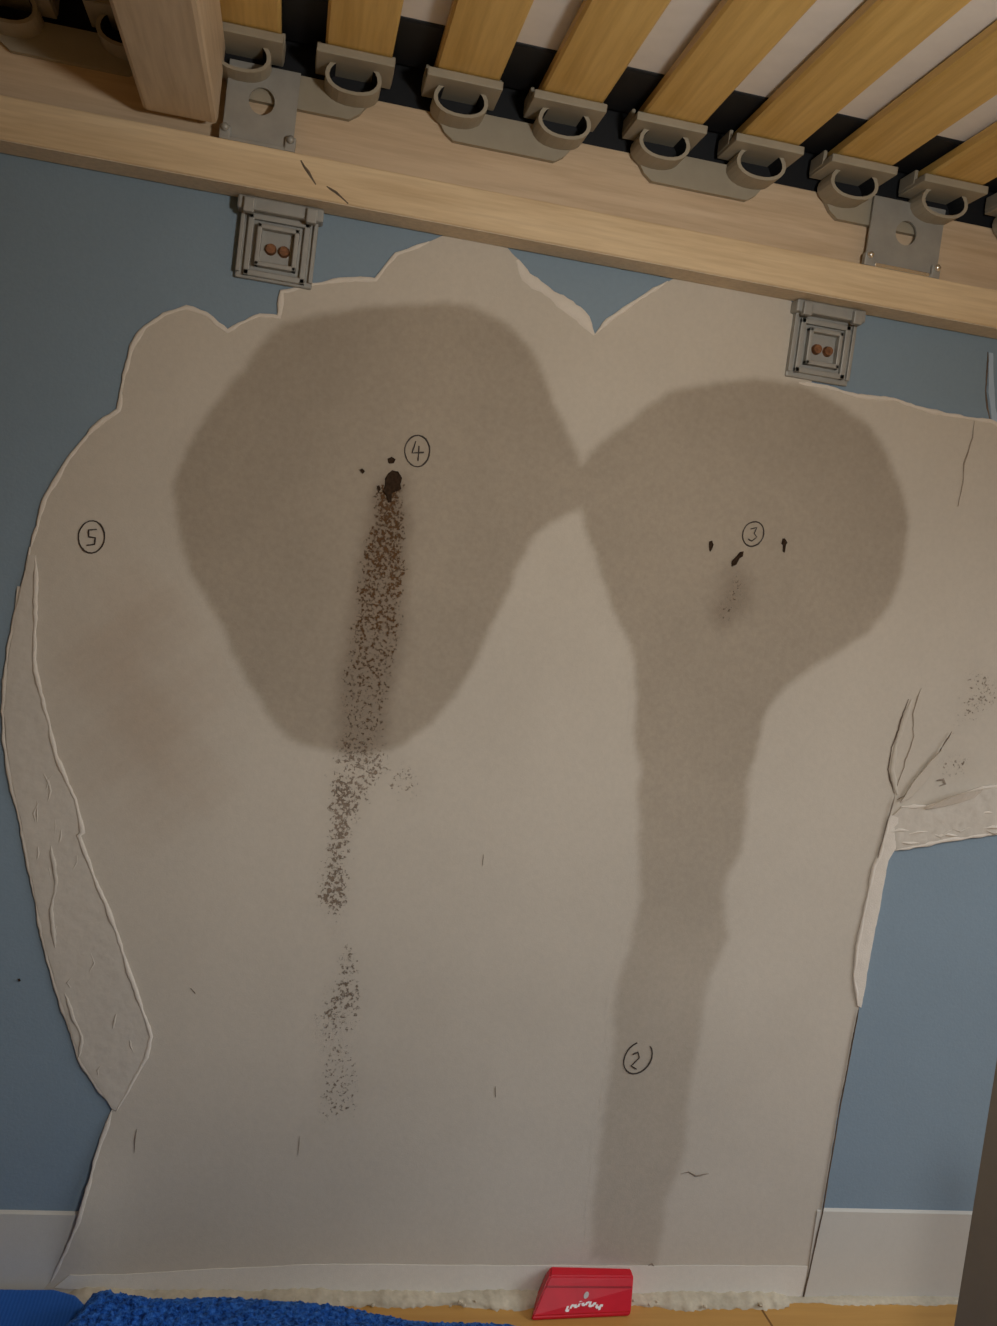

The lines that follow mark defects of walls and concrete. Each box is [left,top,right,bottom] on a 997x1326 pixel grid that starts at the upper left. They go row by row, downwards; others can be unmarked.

crack [958,421,975,506]
peeling [0,236,808,1297]
damp [15,293,916,1266]
peeling [662,382,997,1266]
crack [878,688,952,857]
spalling [67,1286,538,1312]
spalling [631,1291,959,1312]